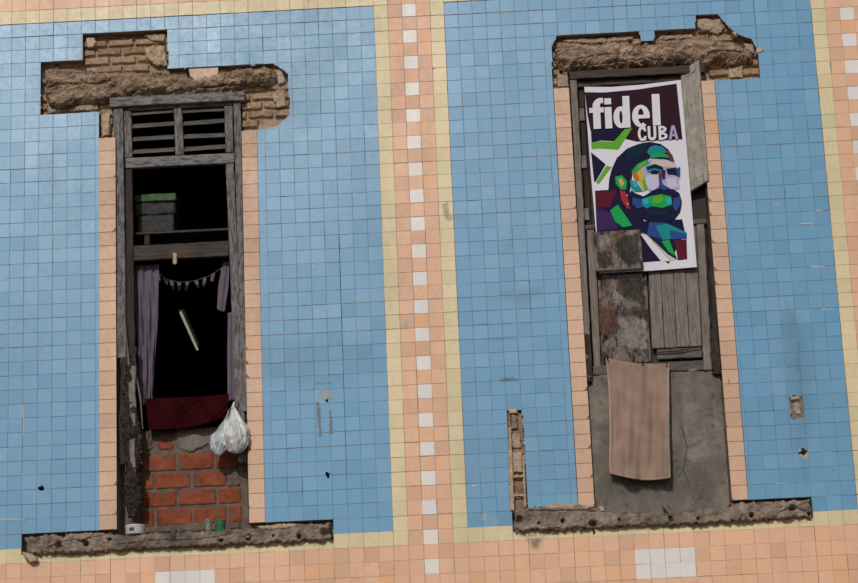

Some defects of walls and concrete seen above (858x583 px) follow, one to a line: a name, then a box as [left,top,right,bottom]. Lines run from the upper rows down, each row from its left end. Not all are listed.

flaking render [40,30,290,138]
flaking render [551,14,813,518]
peeling [496,409,528,515]
spalling [21,530,102,563]
spalling [266,519,334,532]